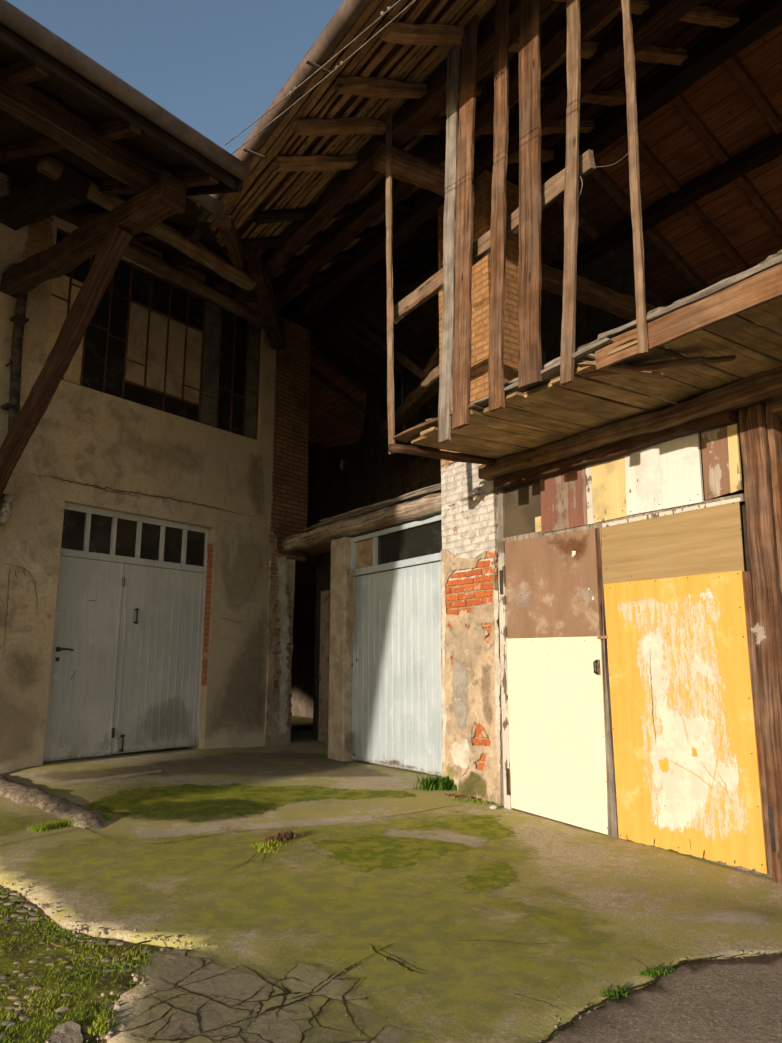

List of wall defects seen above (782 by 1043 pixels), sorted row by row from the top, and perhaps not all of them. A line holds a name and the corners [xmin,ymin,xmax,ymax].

crack [27,474,259,518]
spalling [441,551,501,774]
peeling [618,588,754,846]
crack [110,942,401,1043]
crack [508,954,761,1043]